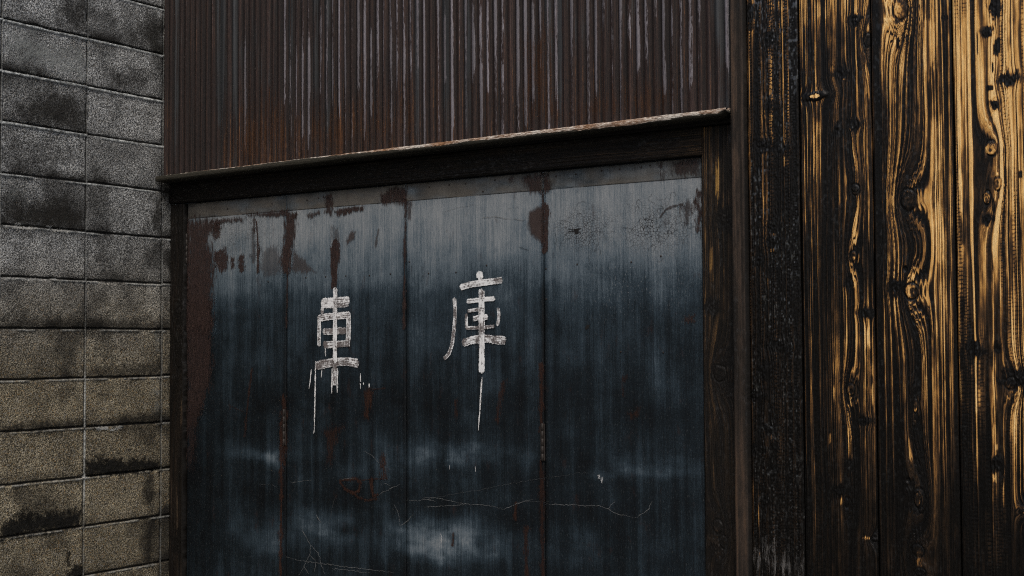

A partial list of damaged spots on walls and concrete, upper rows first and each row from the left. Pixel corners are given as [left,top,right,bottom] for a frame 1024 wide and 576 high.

leakage [6,27,86,133]
rust [521,172,551,254]
rust [187,194,363,426]
leakage [84,455,159,503]
leakage [1,507,85,541]